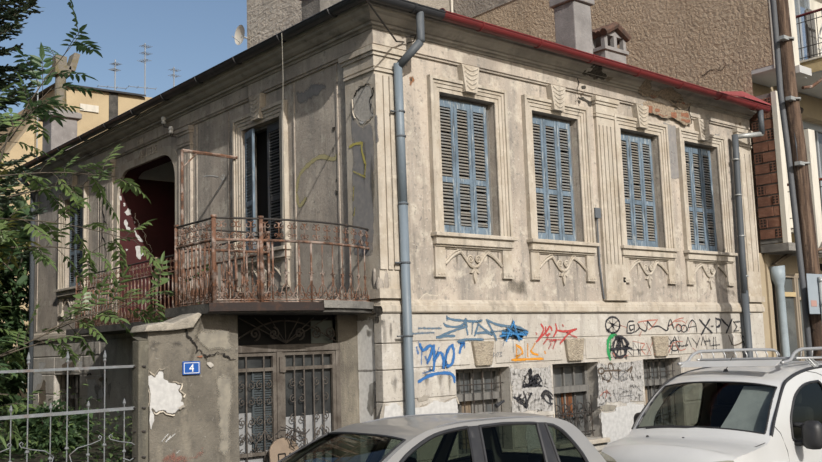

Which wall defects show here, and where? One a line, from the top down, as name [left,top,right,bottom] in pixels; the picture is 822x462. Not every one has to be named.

spalling [638,79,692,179]
peeling [119,196,144,259]
crack [184,329,236,360]
peeling [148,368,186,429]